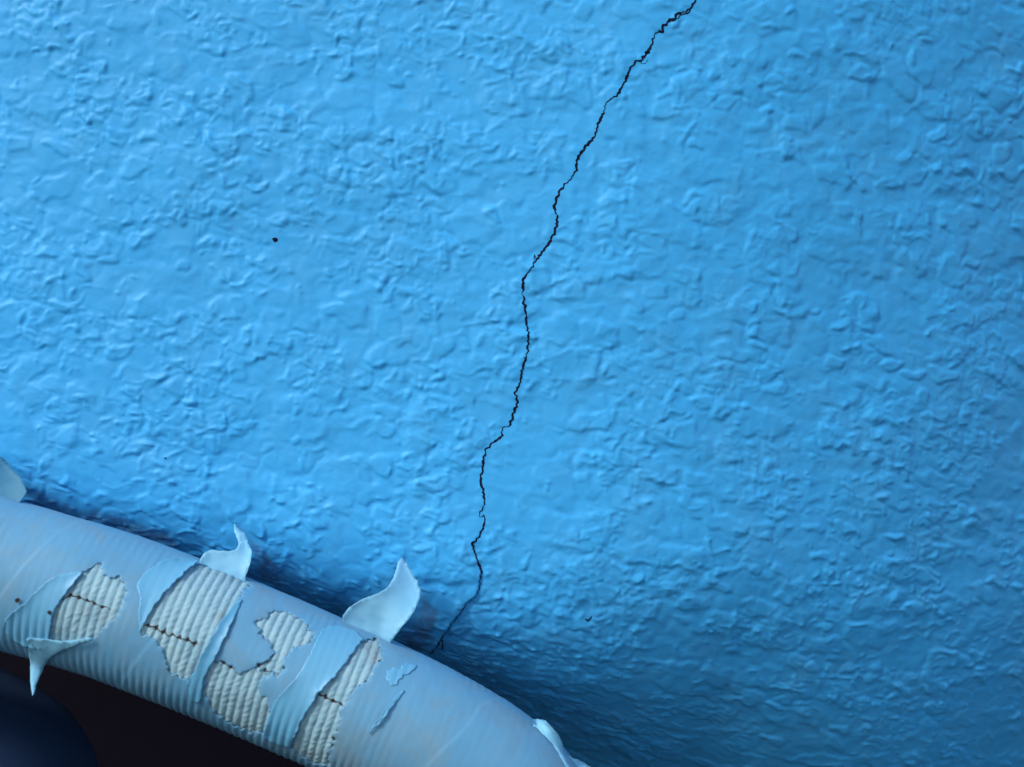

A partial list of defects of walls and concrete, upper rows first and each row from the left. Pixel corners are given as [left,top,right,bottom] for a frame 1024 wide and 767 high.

crack [429,0,696,655]